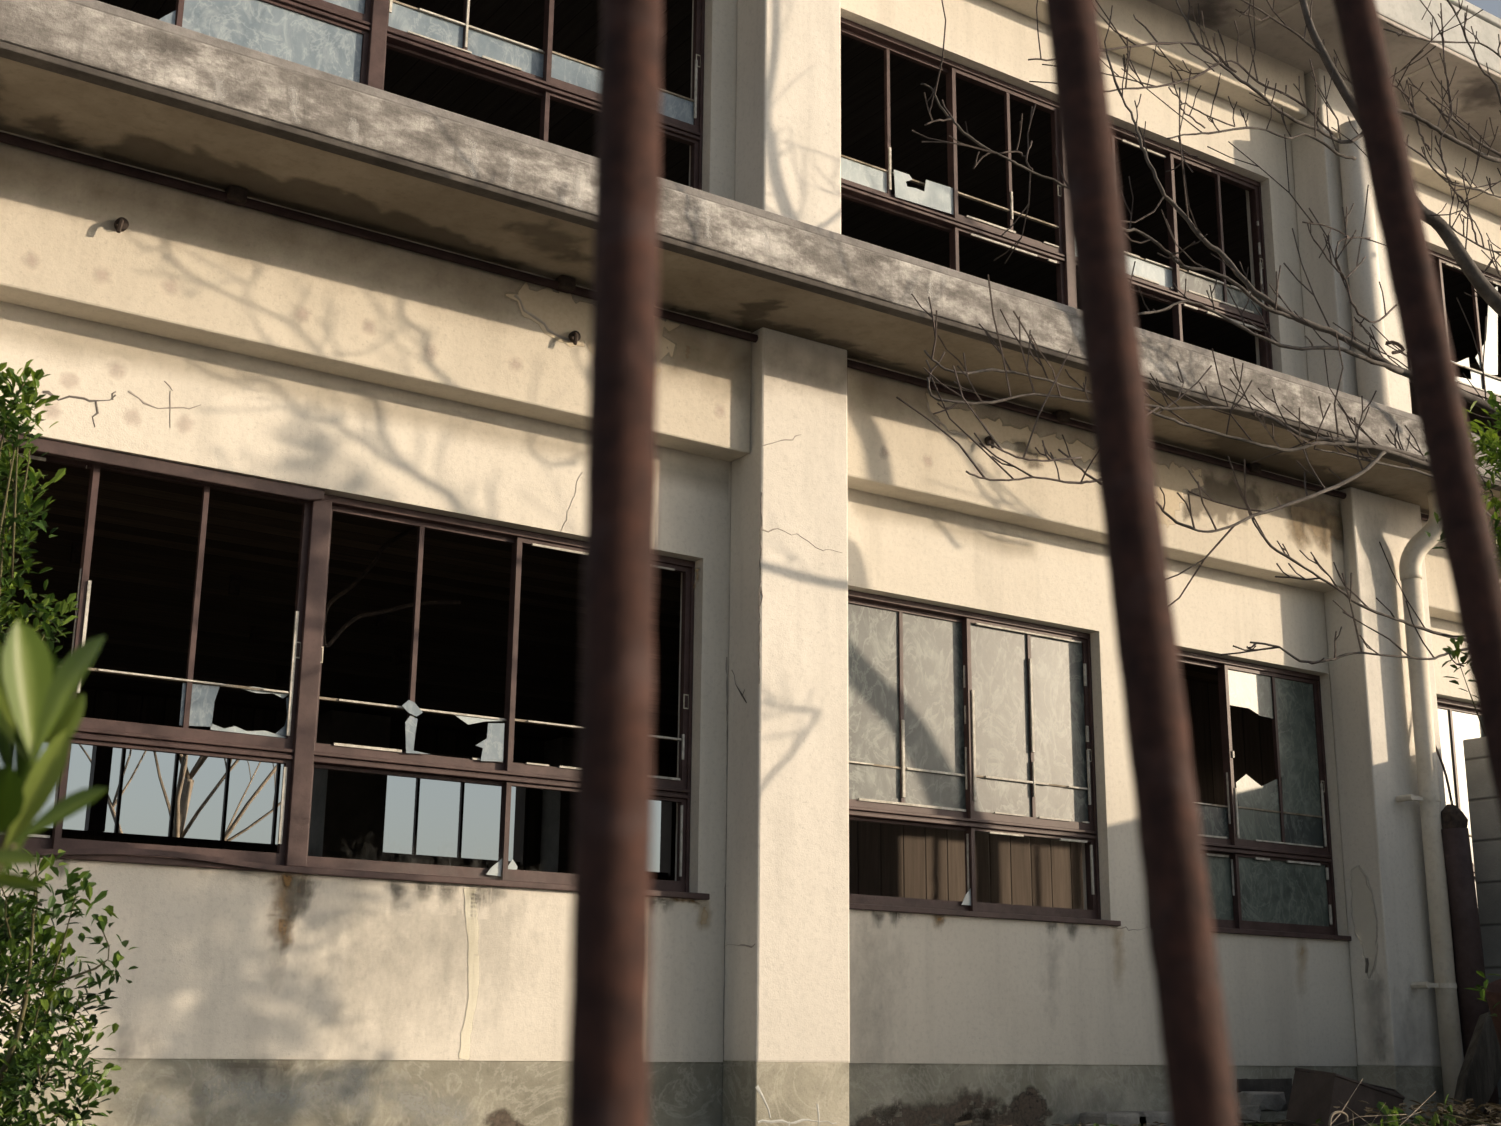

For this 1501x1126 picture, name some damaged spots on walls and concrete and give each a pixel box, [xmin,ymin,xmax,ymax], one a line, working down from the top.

leakage [102,137,520,269]
peeling [505,282,592,350]
peeling [658,318,680,373]
crack [43,381,200,428]
peeling [926,393,1096,465]
leakage [1185,478,1259,522]
leakage [1210,438,1382,550]
crack [723,492,842,1060]